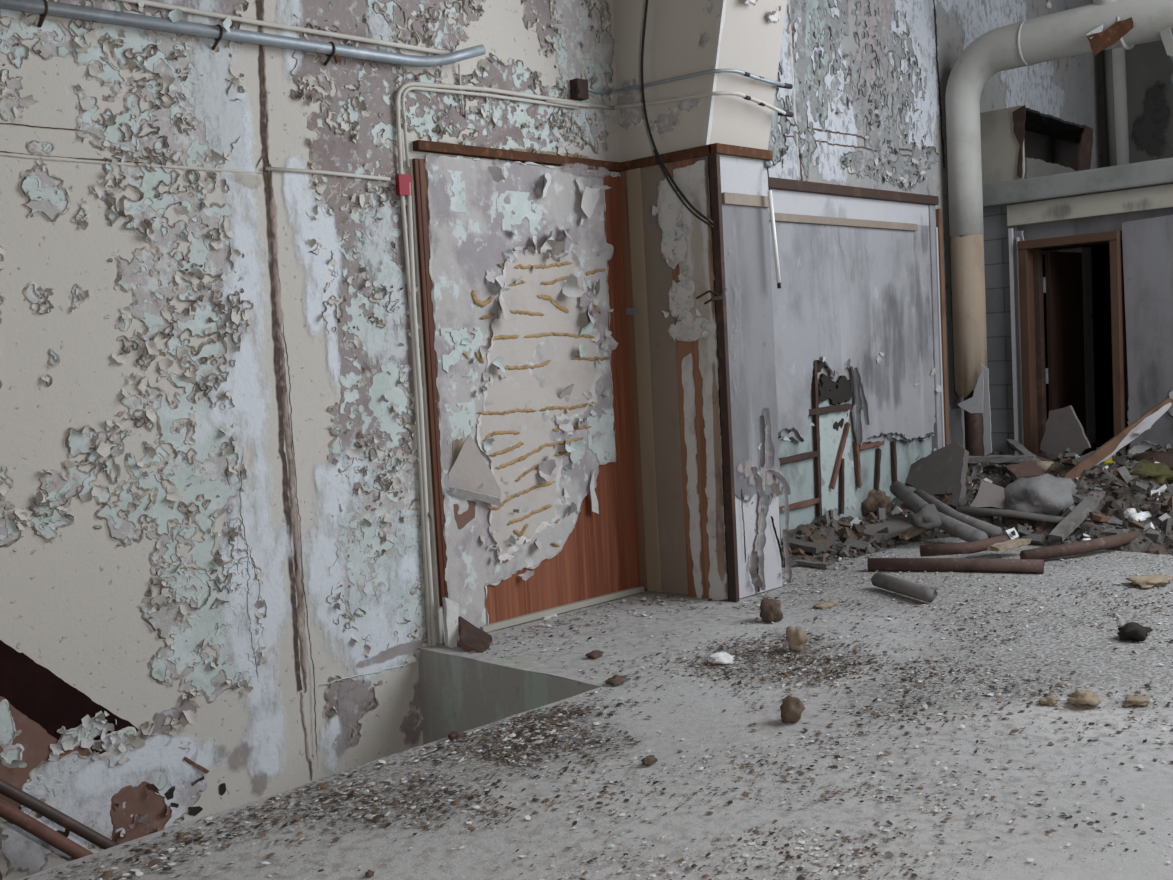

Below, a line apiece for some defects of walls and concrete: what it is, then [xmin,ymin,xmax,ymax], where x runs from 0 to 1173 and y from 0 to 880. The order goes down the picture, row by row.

leakage [768,0,1027,185]
peeling [652,177,716,341]
crack [0,0,419,780]
peeling [1127,440,1171,456]
peeling [399,577,1173,880]
peeling [0,817,75,880]